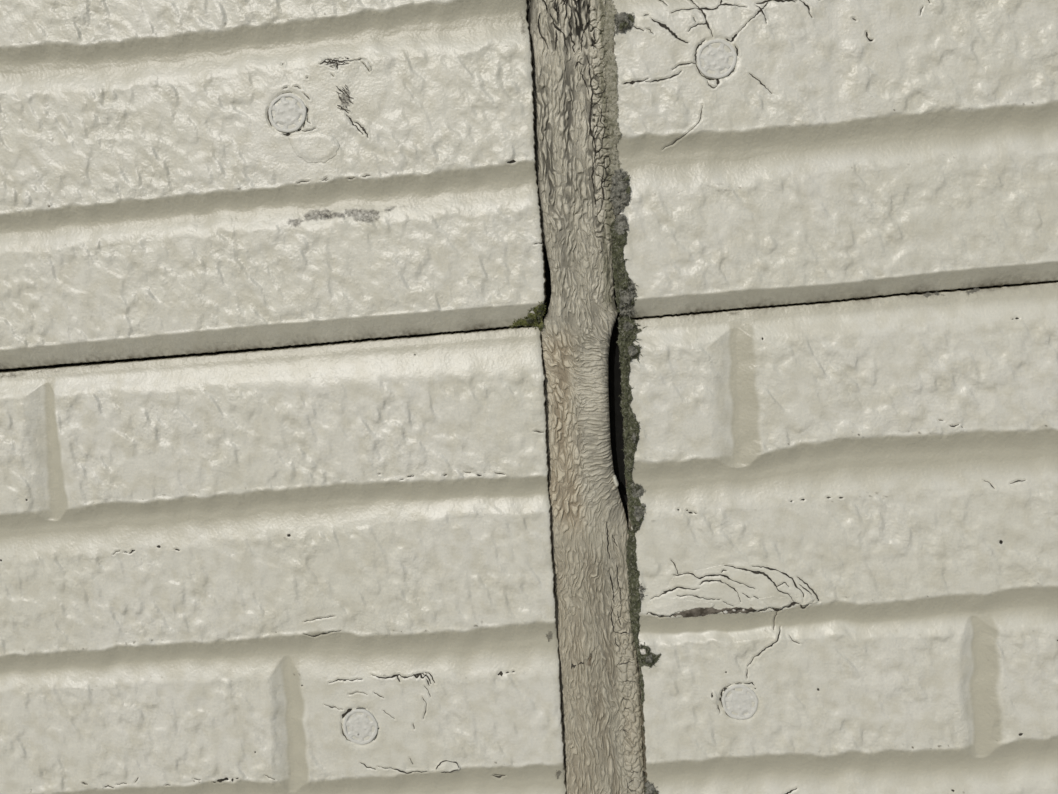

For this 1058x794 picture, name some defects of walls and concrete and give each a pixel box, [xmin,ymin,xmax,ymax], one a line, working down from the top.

crack [267,57,370,137]
crack [538,0,812,208]
peeling [647,560,819,618]
crack [324,672,435,774]